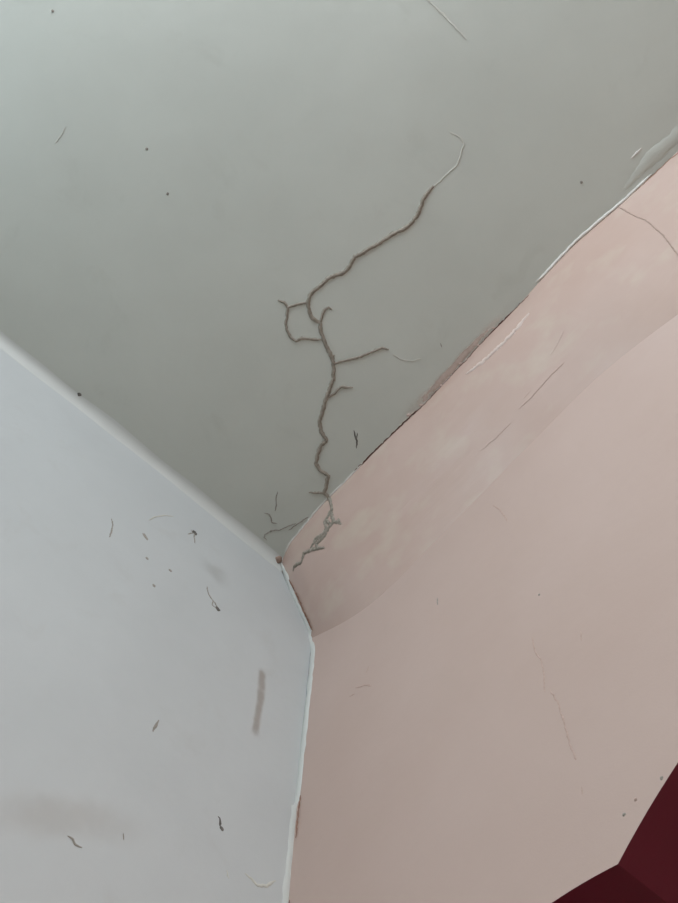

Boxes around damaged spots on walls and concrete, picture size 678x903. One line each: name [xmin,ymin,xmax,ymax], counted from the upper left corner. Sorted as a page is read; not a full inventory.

crack [618,206,678,256]
crack [264,132,465,630]
crack [355,295,529,470]
crack [294,795,302,838]